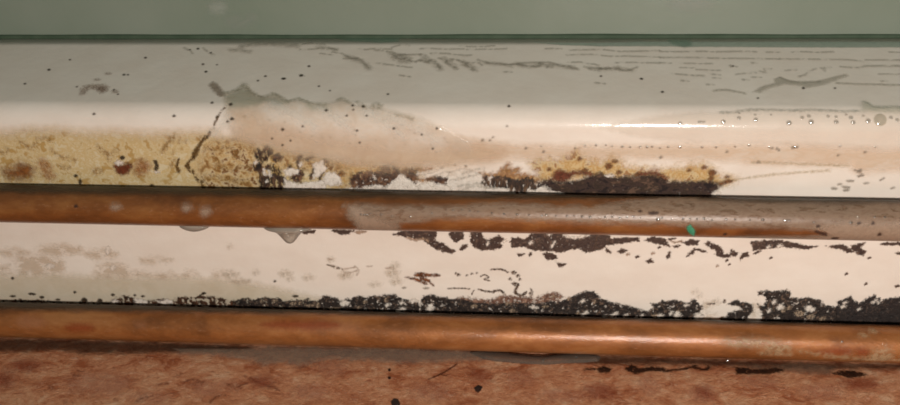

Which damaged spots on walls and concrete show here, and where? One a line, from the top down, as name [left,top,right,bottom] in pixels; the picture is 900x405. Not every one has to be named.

crack [175,107,225,188]
leakage [0,132,451,193]
peeling [393,231,872,267]